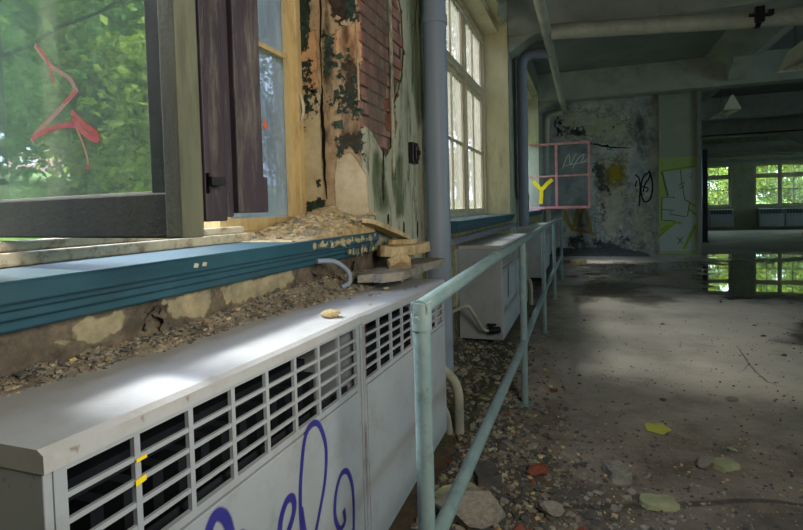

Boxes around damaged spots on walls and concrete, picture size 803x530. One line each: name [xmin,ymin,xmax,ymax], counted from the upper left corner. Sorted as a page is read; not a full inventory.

spalling [299,0,406,162]
spalling [0,233,391,377]